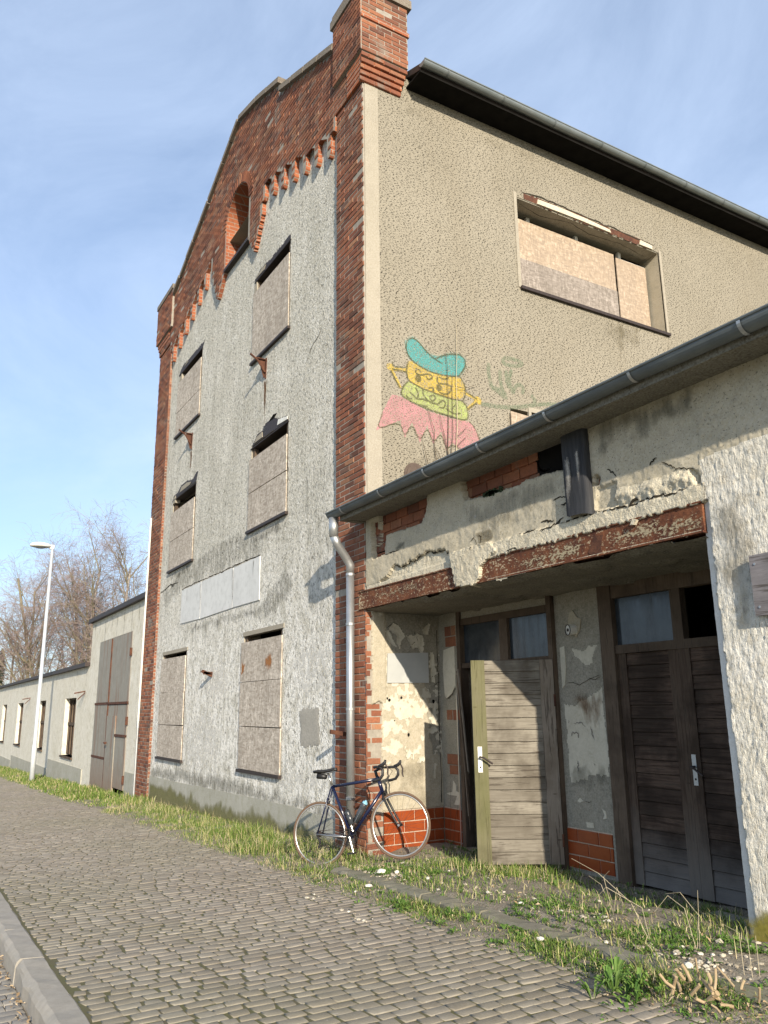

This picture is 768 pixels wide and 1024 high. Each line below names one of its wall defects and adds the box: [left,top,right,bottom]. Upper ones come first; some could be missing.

flaking render [537,200,611,233]
flaking render [375,498,427,557]
flaking render [466,453,540,498]
peeling [516,538,585,567]
crack [507,458,693,552]
peeling [609,518,706,548]
flaking render [615,469,702,506]
peeling [377,550,460,805]
peeling [560,645,597,688]
peeling [564,687,610,783]